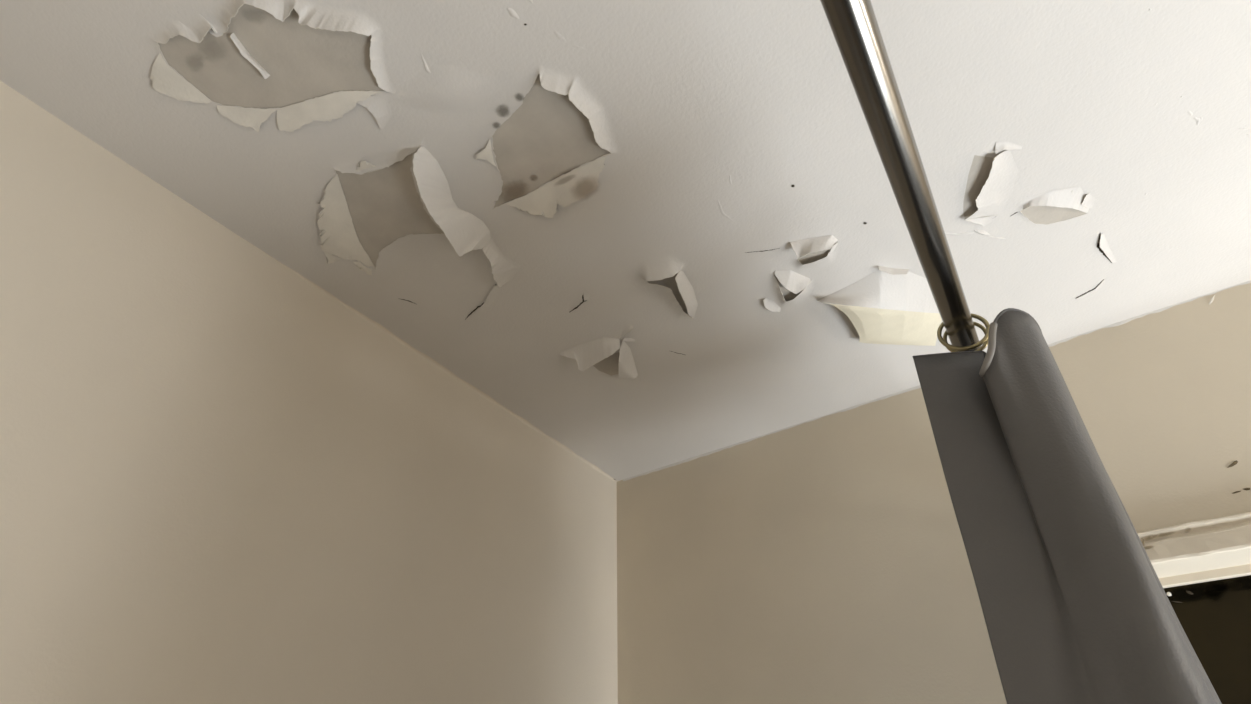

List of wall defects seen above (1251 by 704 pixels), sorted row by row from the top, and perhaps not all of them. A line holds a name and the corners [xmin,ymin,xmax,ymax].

peeling [143,0,396,132]
peeling [317,63,622,322]
peeling [963,141,1095,234]
peeling [632,252,700,324]
peeling [763,235,942,346]
peeling [560,324,638,379]